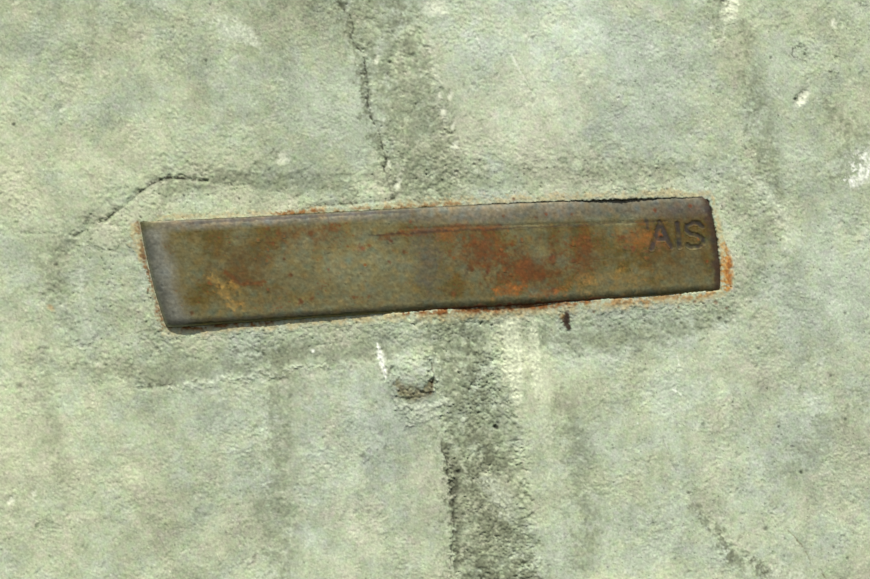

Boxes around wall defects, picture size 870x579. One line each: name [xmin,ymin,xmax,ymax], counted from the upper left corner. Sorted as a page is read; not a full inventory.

crack [312,0,397,207]
crack [14,175,252,238]
corrosion [126,185,736,342]
crack [441,447,470,579]